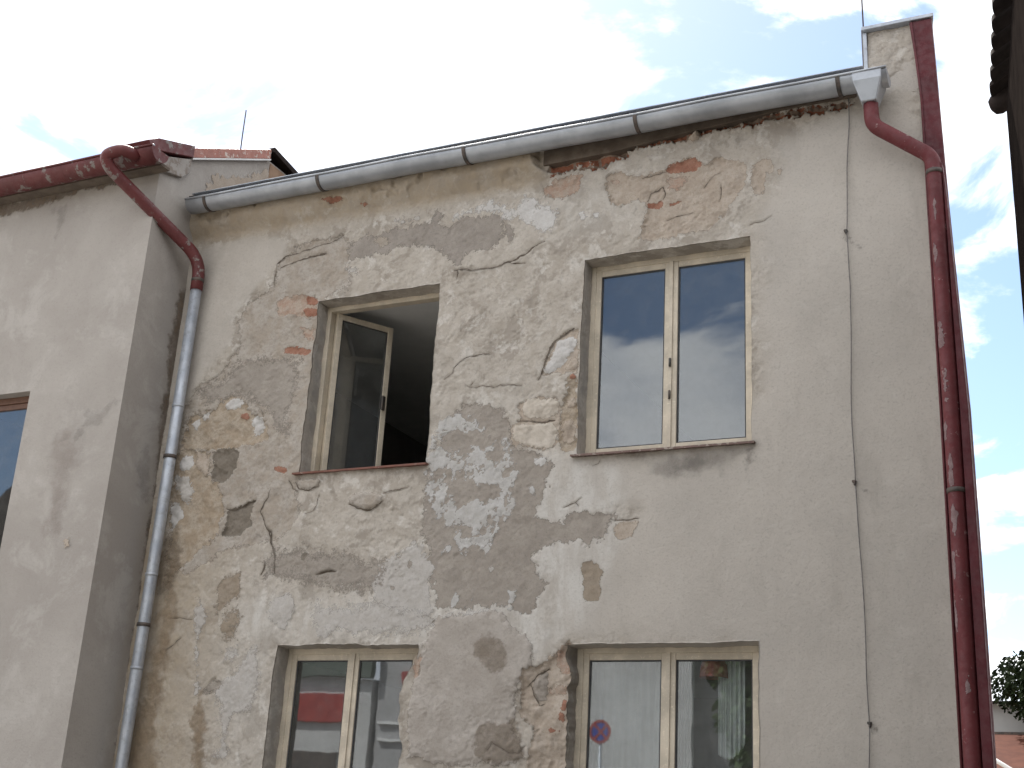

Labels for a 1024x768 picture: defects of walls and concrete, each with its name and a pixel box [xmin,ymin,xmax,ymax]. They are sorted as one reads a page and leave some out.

crack [273,236,343,287]
crack [454,241,545,279]
crack [445,353,520,388]
flaking render [163,102,854,617]
crack [260,489,275,575]
flaking render [519,640,572,768]